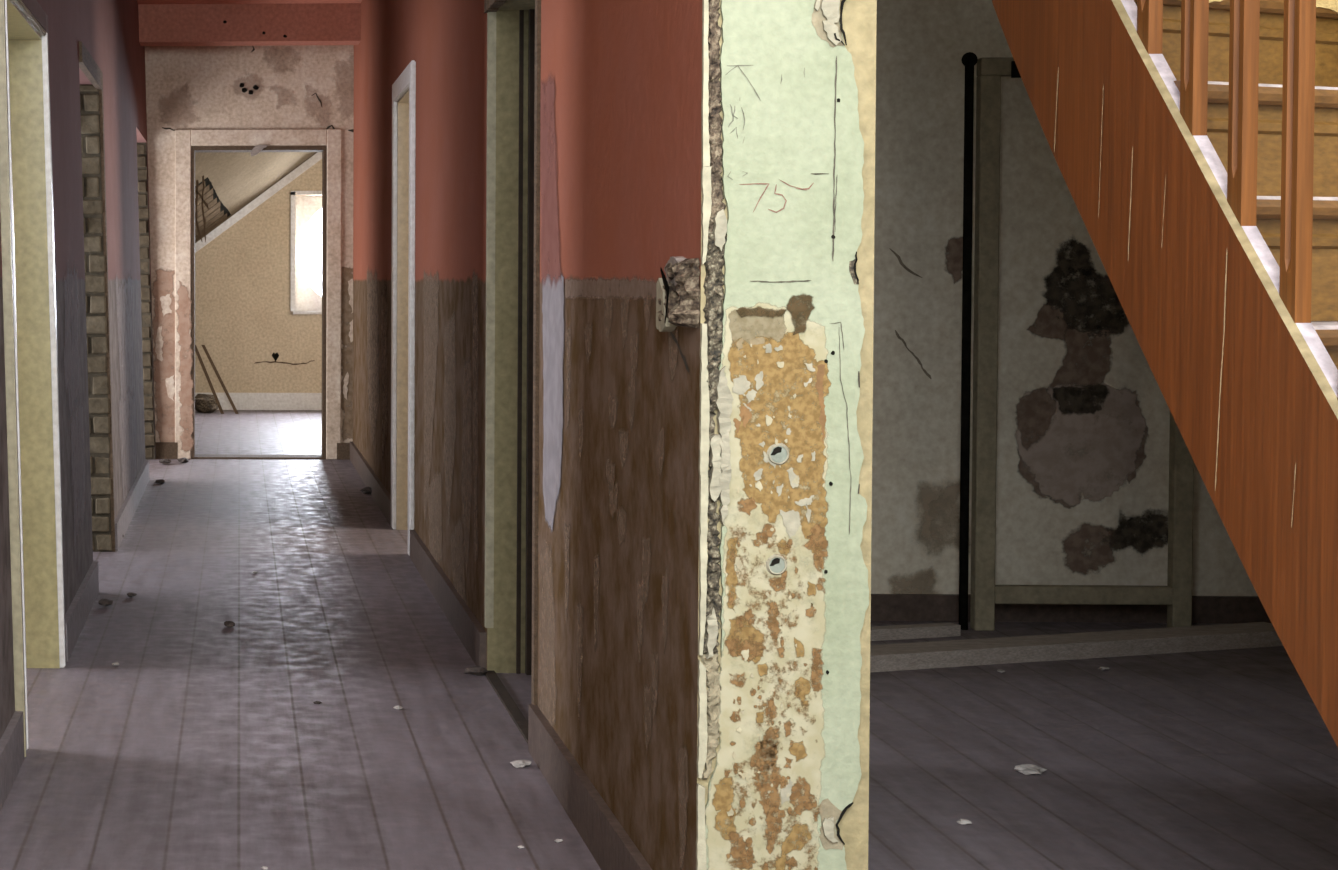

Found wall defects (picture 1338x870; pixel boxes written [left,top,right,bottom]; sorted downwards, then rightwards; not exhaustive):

flaking render [137,142,194,460]
flaking render [539,0,869,870]